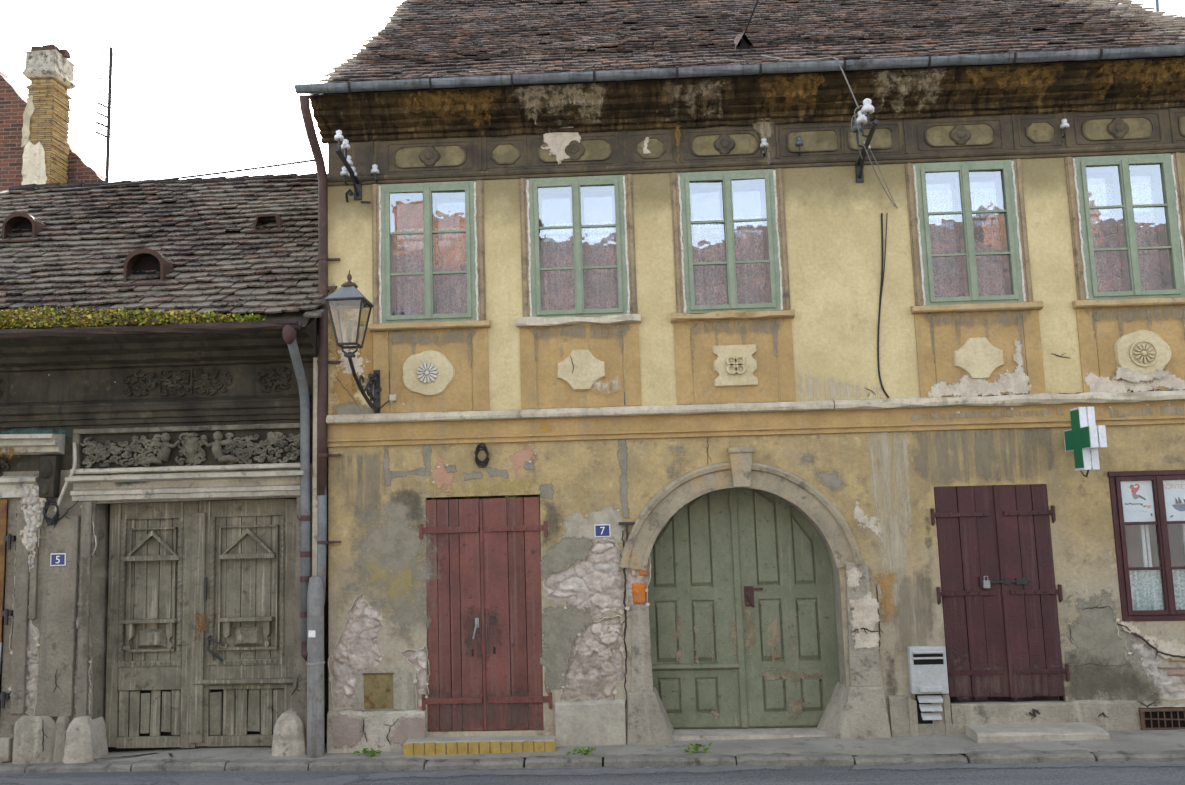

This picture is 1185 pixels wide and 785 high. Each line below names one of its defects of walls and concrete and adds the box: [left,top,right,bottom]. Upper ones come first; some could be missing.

peeling [541,127,581,164]
peeling [911,340,1062,421]
peeling [1084,366,1185,417]
spalling [8,484,46,715]
flaking render [328,496,436,749]
spalling [543,506,651,702]
peeling [846,566,880,650]
flaking render [1060,589,1185,702]